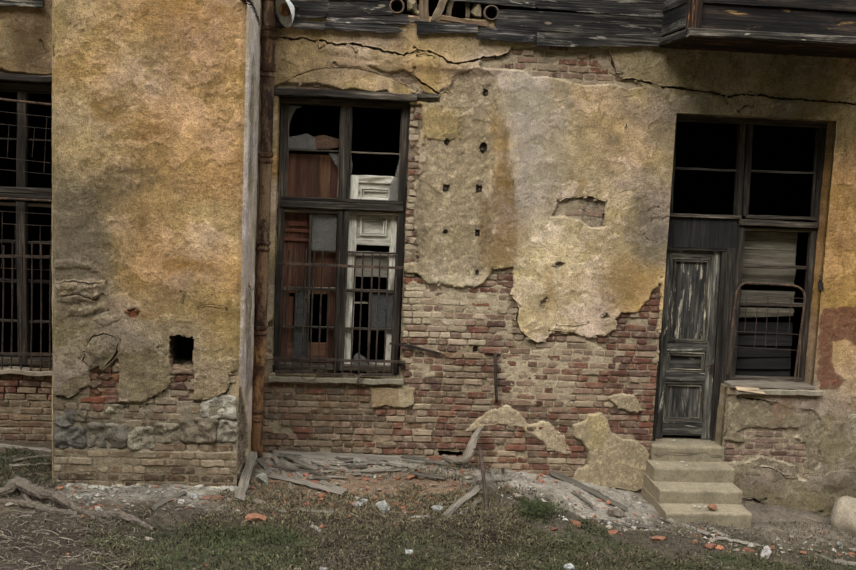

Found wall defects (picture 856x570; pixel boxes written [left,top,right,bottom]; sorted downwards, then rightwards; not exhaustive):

crack [227,0,512,101]
crack [607,50,856,112]
flaking render [56,281,107,316]
spalling [263,45,662,479]
spalling [0,325,249,493]
flaking render [723,394,824,478]